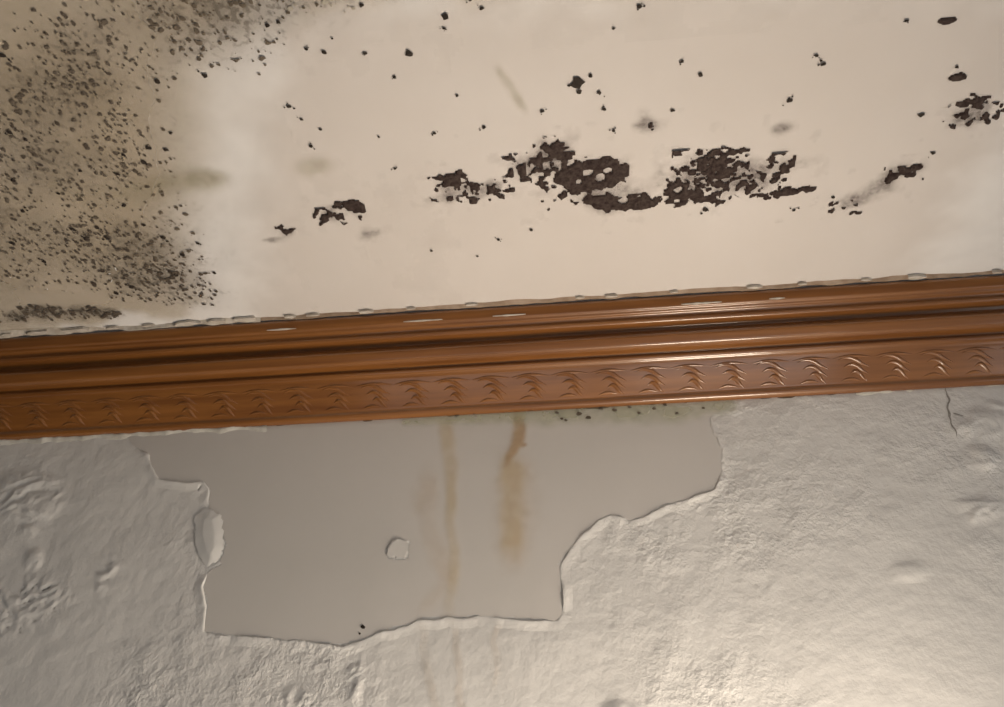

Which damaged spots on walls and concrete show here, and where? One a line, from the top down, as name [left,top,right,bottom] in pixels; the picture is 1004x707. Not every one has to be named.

damp [937,17,957,25]
damp [567,74,593,94]
damp [948,66,967,82]
damp [943,93,1004,130]
damp [0,0,366,323]
damp [428,136,817,215]
damp [884,152,936,184]
damp [828,196,862,215]
crack [945,388,963,438]
peeling [128,400,732,657]